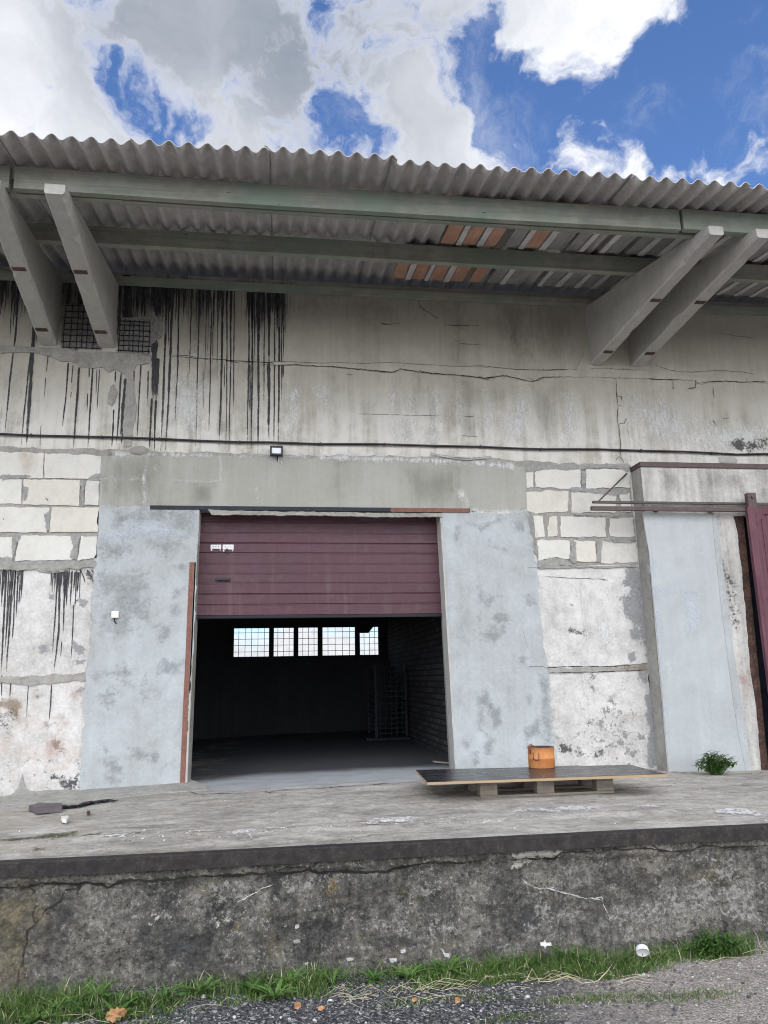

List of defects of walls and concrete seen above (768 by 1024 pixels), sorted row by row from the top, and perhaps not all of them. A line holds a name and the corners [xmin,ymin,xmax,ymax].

water stain [62,283,83,305]
water stain [0,280,48,442]
water stain [62,363,100,444]
water stain [111,275,298,451]
crack [175,301,766,462]
water stain [0,570,24,696]
water stain [51,569,94,667]